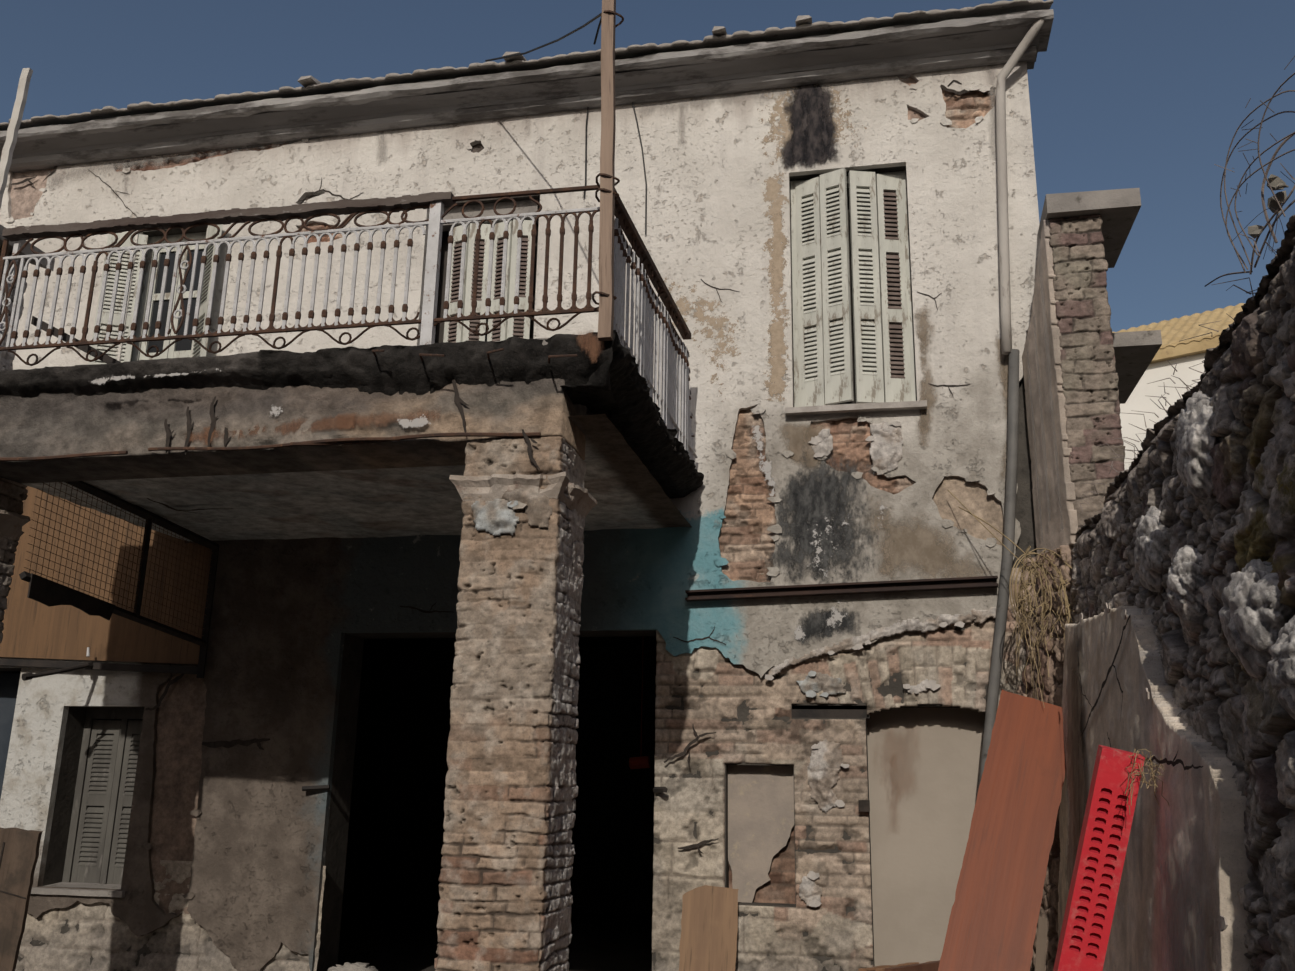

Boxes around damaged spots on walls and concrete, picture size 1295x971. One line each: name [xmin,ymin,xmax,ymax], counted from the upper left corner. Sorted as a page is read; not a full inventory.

spalling [899,77,917,90]
spalling [907,82,995,128]
crack [11,166,57,186]
crack [89,170,134,214]
spalling [811,416,915,494]
water stain [752,424,984,637]
crack [1077,615,1130,747]
crack [664,725,716,768]
flaking render [652,568,1030,971]
crack [1146,752,1203,782]
flaking render [15,665,237,971]
flaking render [263,866,326,971]